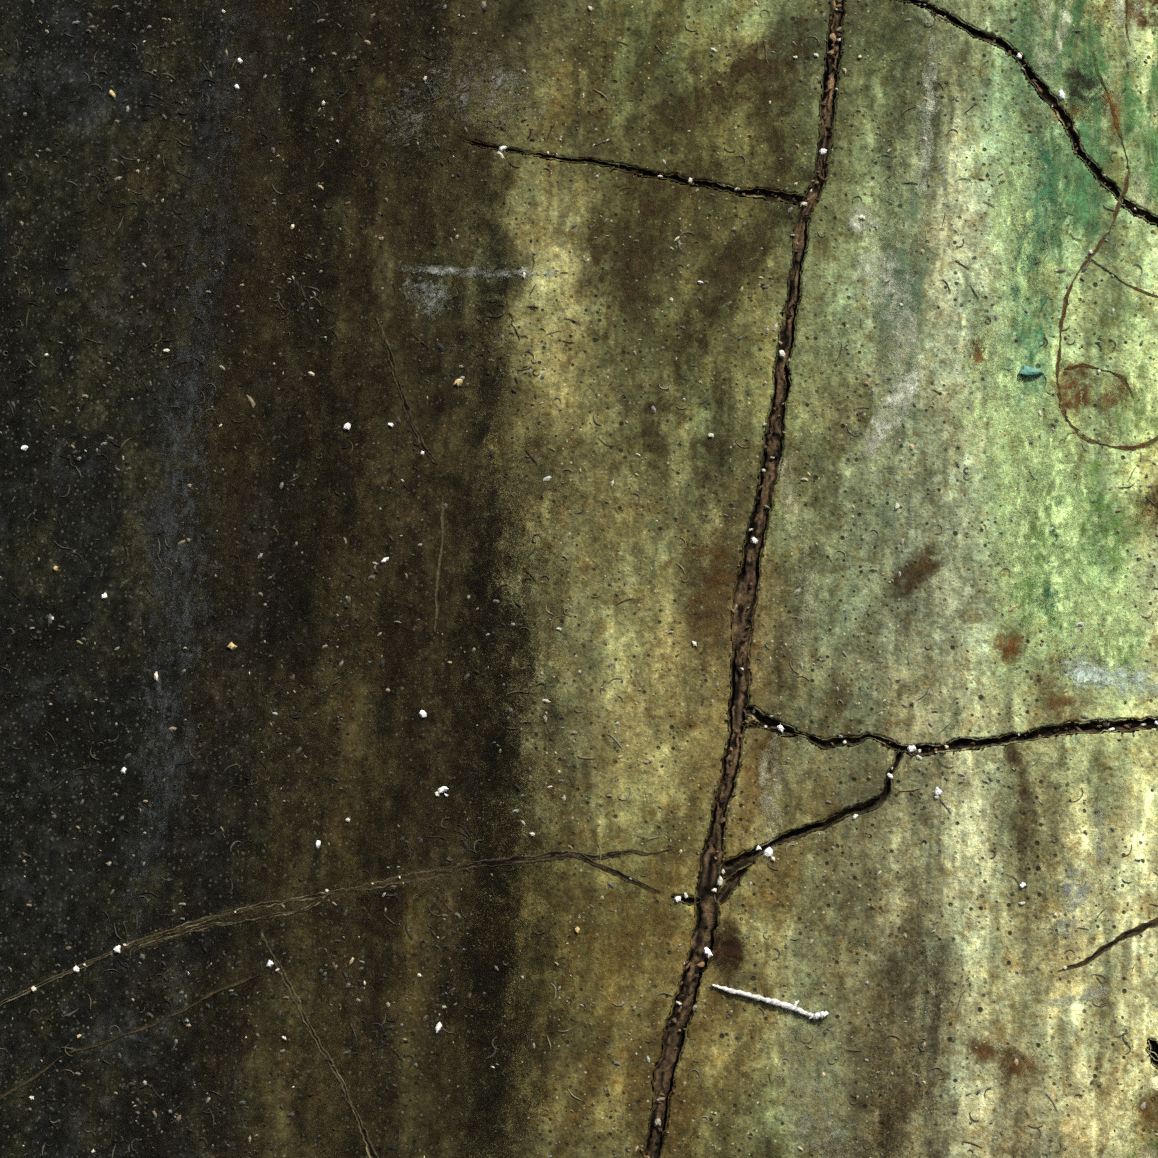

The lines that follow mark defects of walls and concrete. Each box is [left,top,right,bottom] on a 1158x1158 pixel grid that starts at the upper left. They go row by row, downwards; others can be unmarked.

leakage [0,0,553,1158]
crack [462,0,1158,1158]
rust [893,544,944,597]
rust [1059,365,1131,412]